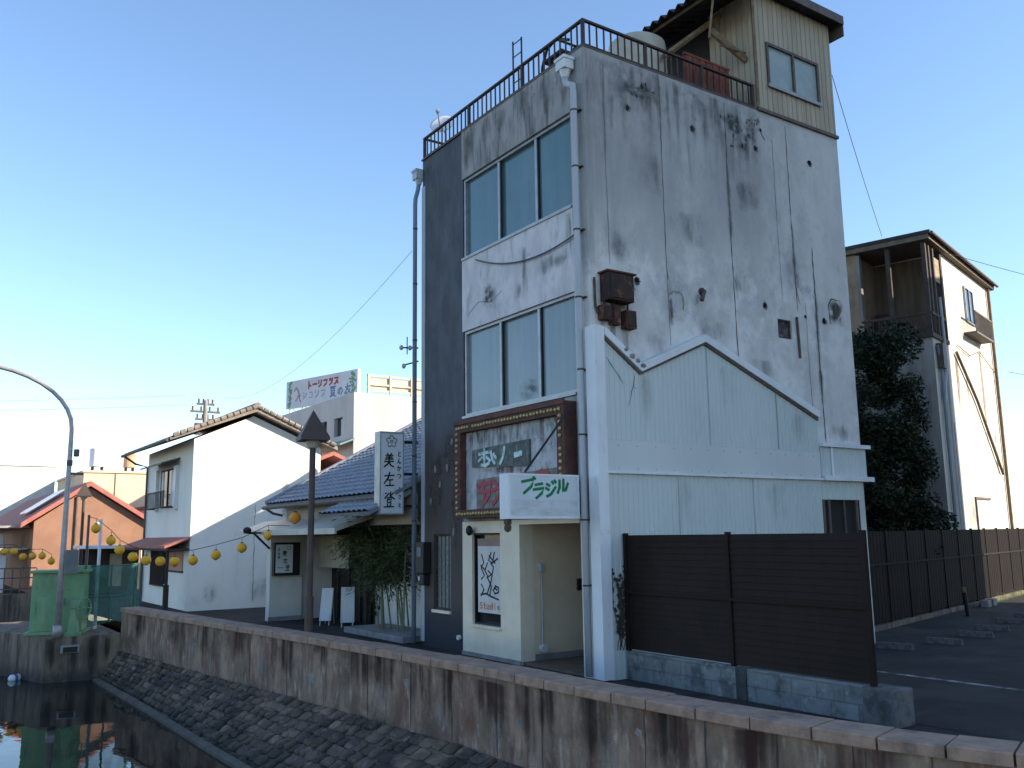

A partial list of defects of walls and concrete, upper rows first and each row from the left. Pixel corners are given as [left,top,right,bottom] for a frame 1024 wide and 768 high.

mould [720,114,759,150]